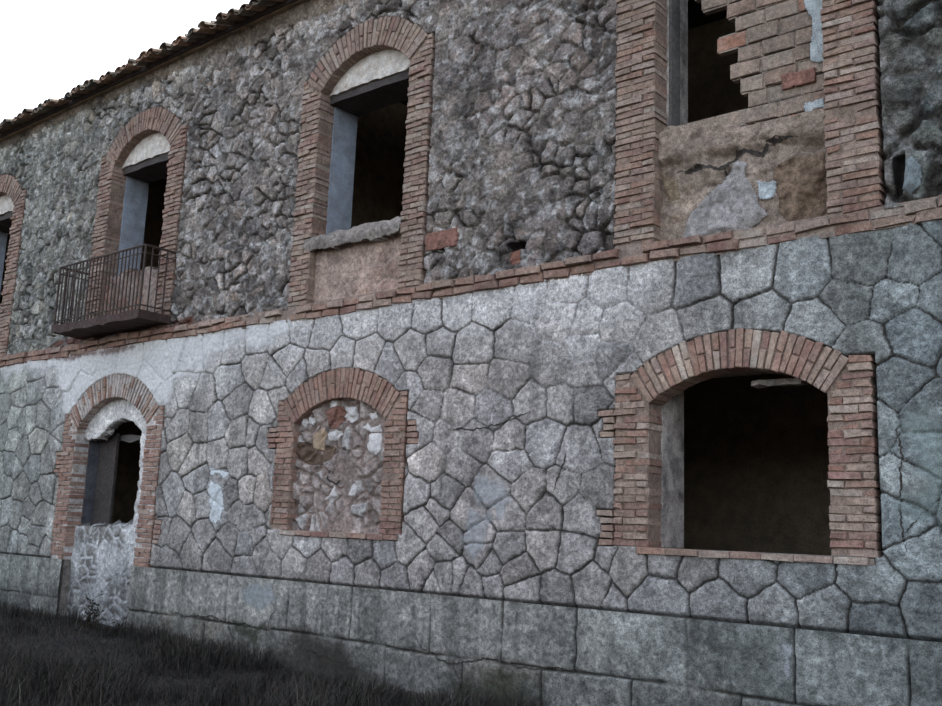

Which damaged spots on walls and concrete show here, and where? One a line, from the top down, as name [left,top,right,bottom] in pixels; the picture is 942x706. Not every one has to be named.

flaking render [781,0,824,91]
flaking render [803,98,825,112]
crack [678,135,798,180]
crack [895,424,942,553]